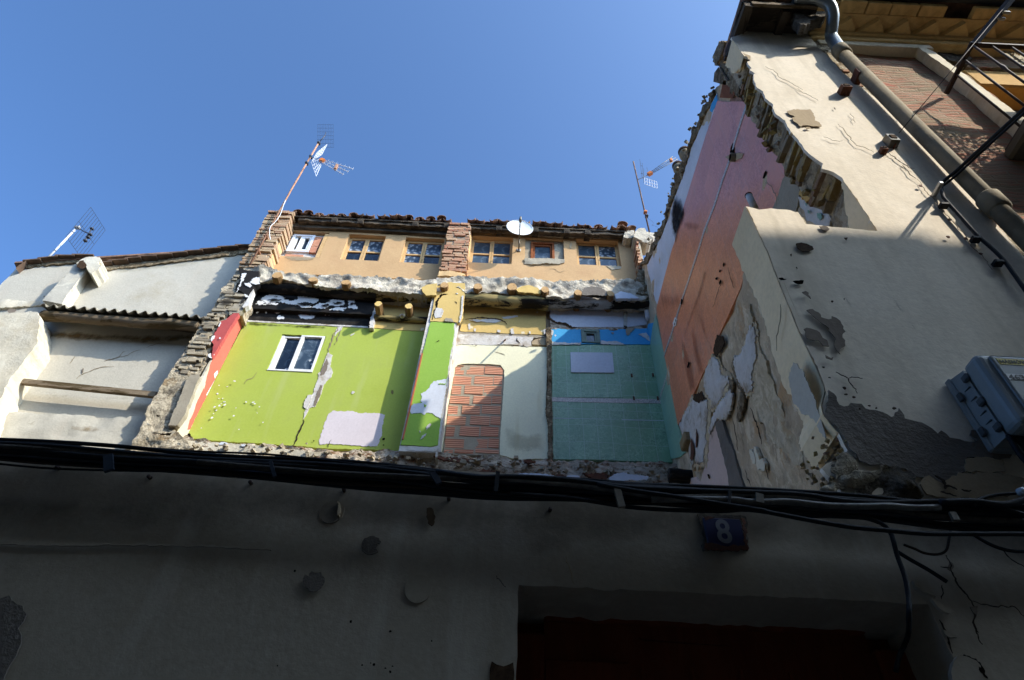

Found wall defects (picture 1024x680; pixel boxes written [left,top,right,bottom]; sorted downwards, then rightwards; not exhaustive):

peeling [787,109,822,129]
flaking render [798,190,833,231]
peeling [434,293,531,346]
flaking render [582,286,607,296]
peeling [303,352,333,419]
peeling [410,379,447,440]
flaking render [679,323,758,479]
flaking render [779,242,1024,499]
flaking render [0,595,27,680]
crack [939,555,1024,679]